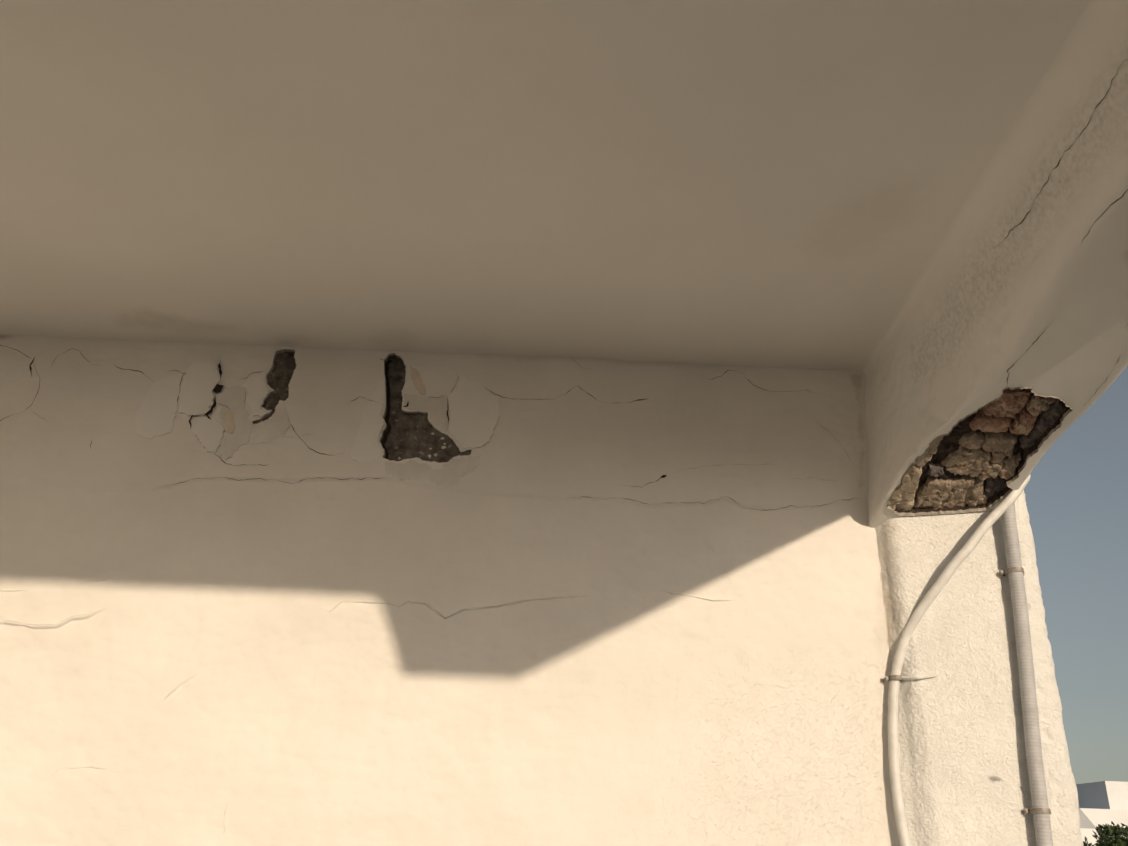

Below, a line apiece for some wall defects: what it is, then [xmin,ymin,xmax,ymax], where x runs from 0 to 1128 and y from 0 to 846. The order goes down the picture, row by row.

crack [993,59,1128,249]
crack [0,345,183,422]
peeling [134,349,297,466]
crack [159,408,379,488]
spalling [380,353,472,463]
crack [582,464,854,511]
spalling [887,387,1073,516]